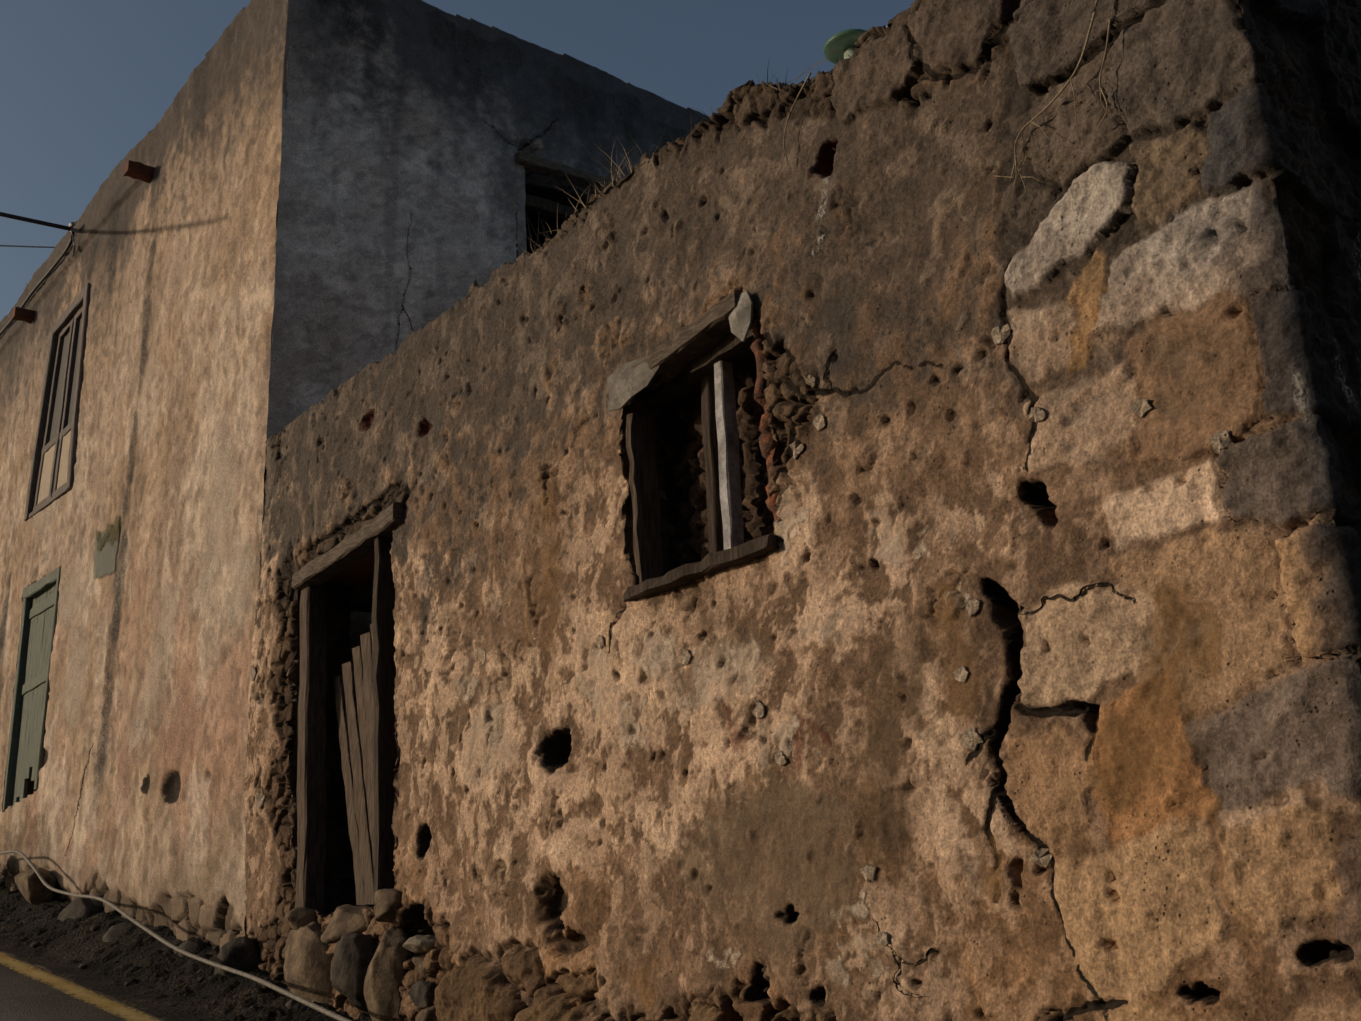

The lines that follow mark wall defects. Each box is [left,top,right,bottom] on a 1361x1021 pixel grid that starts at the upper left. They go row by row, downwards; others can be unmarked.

leakage [122,412,137,514]
leakage [139,241,155,389]
crack [395,214,413,353]
flaking render [773,496,808,568]
crack [764,332,942,507]
crack [991,259,1046,472]
leakage [95,531,127,783]
flaking render [631,628,800,763]
flaking render [953,665,969,682]
crack [962,578,1136,1021]
hole [546,879,589,953]
flaking render [847,890,868,918]